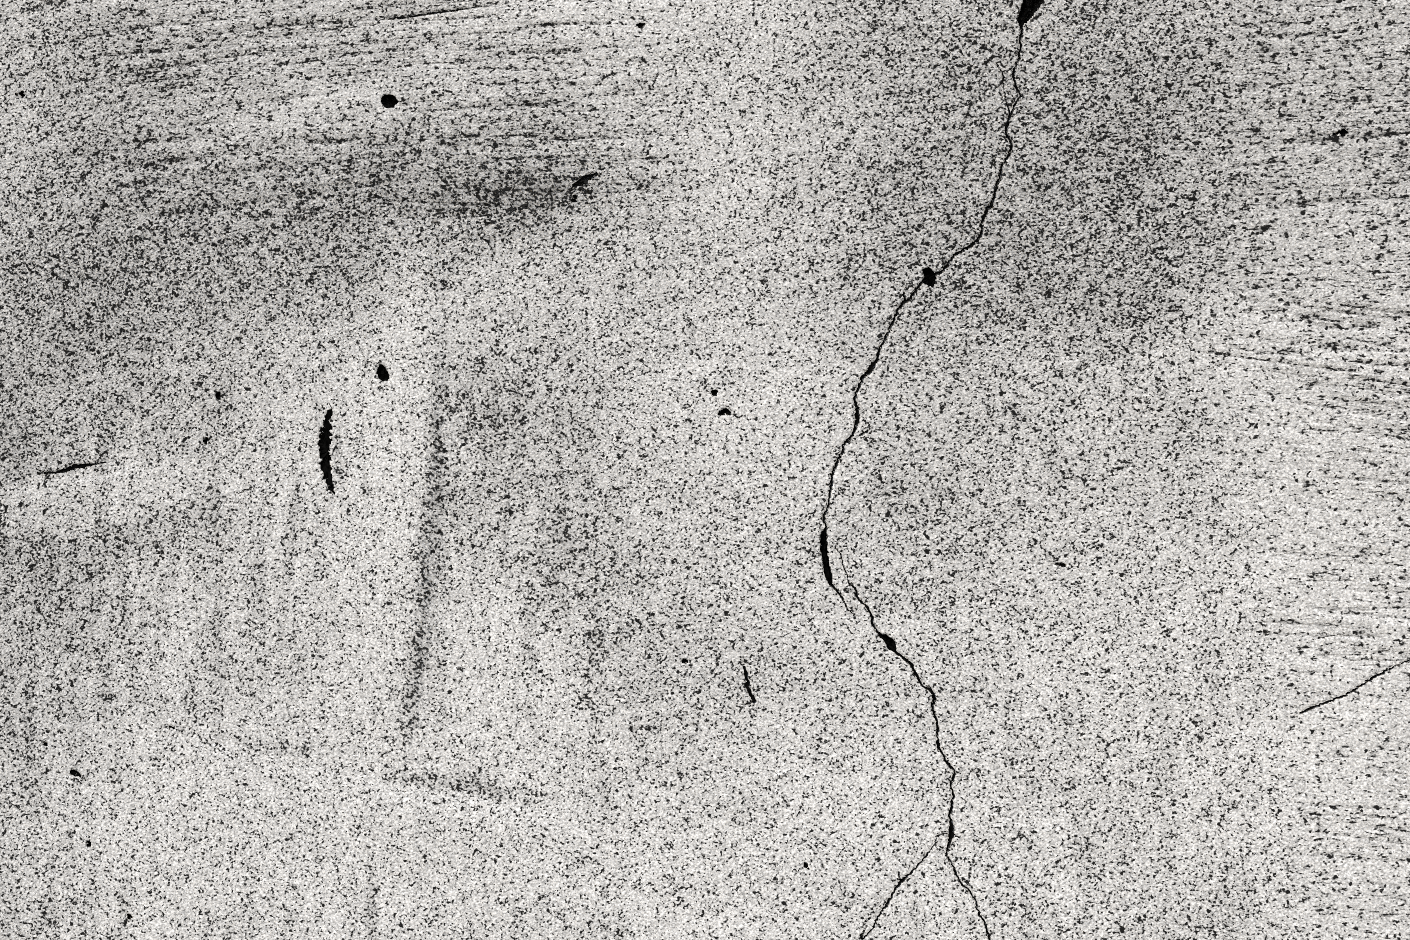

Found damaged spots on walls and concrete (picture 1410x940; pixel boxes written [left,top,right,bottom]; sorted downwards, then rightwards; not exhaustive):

crack [822,0,1030,940]